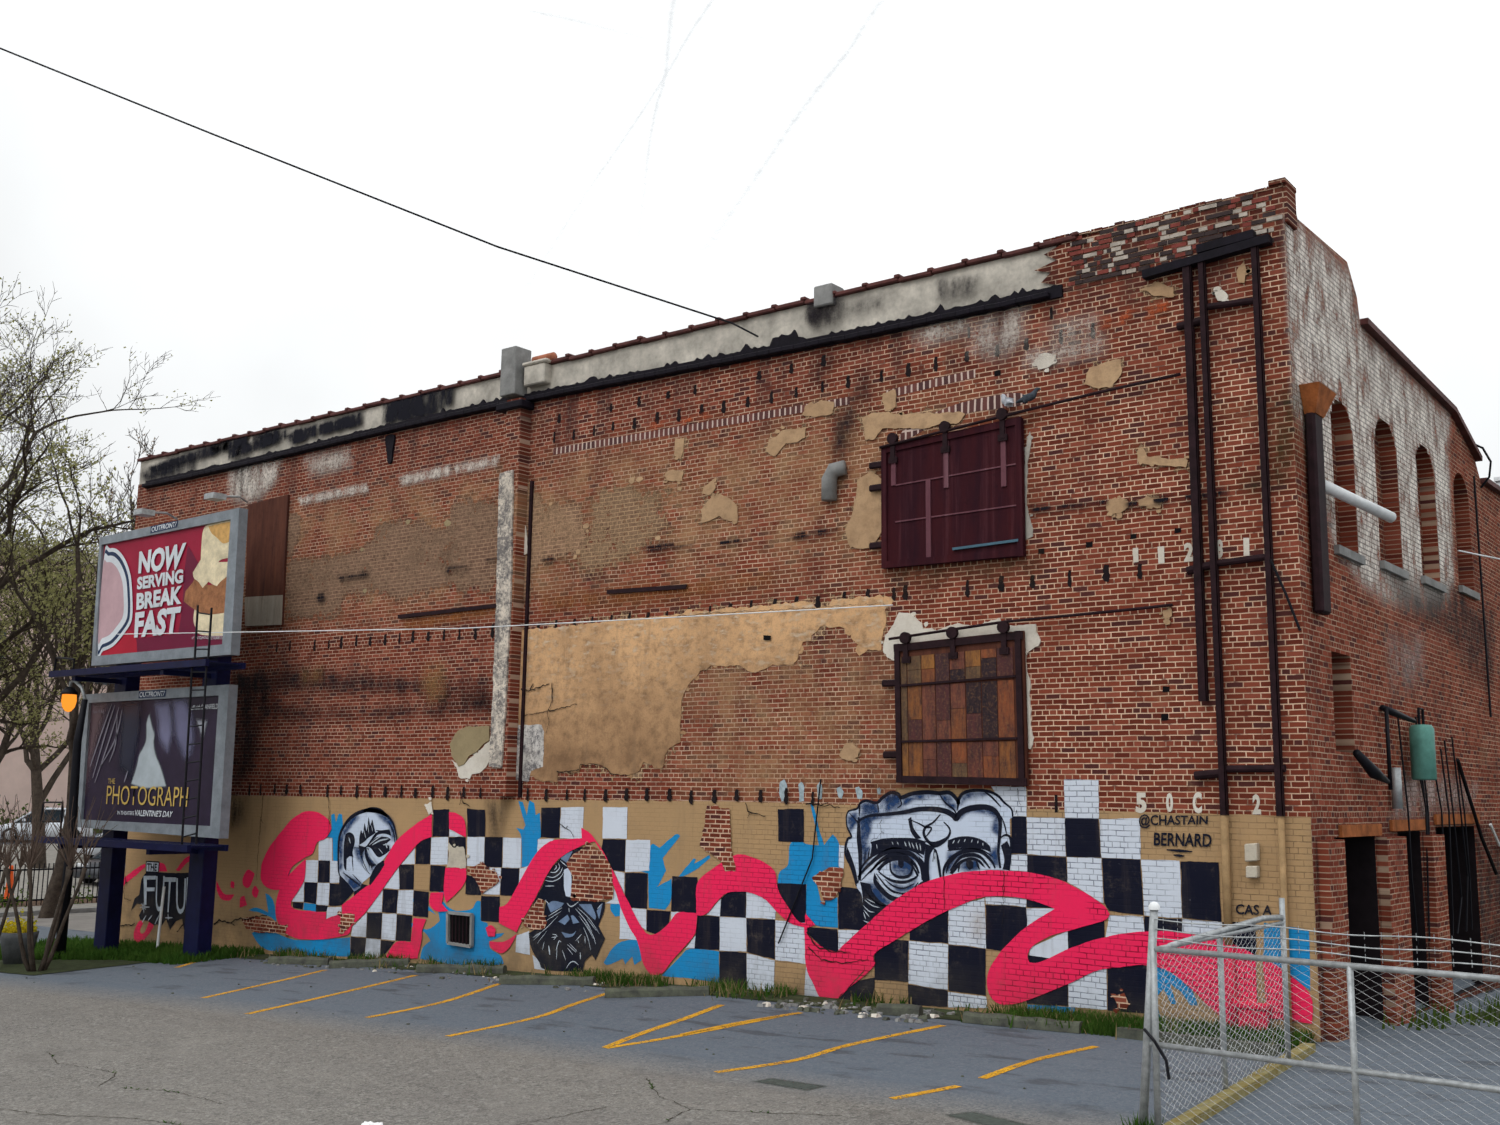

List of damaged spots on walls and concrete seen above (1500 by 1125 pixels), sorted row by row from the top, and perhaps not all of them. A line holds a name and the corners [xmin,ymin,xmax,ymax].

water stain [383,387,453,423]
water stain [142,412,362,501]
water stain [300,486,368,504]
water stain [402,458,496,483]
peeling [452,741,490,782]
peeling [516,724,544,783]
peeling [700,805,736,871]
peeling [567,841,613,902]